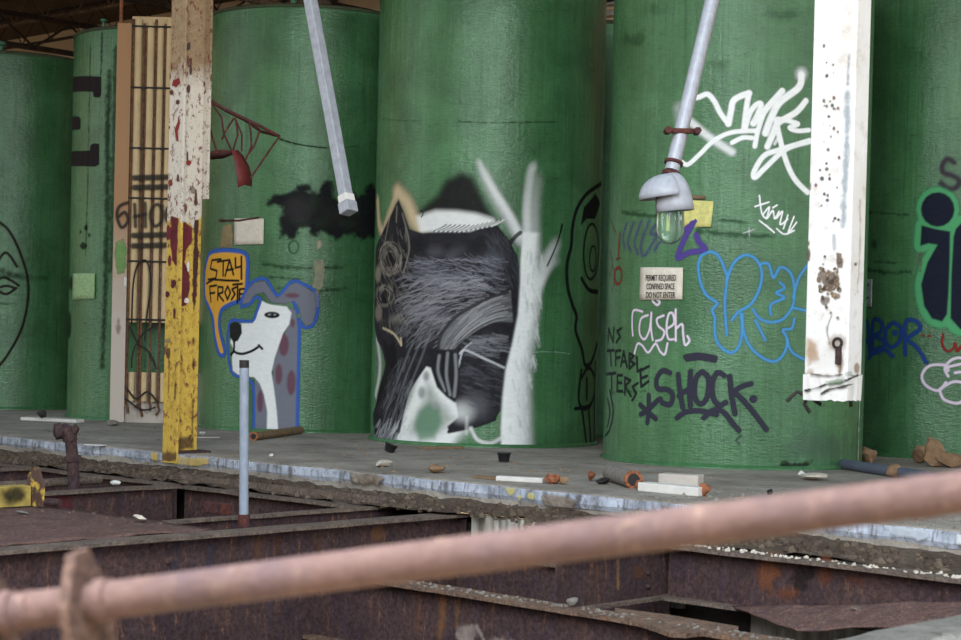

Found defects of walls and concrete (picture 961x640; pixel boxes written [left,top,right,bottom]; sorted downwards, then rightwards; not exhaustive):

peeling [169,42,192,104]
peeling [165,187,199,319]
spalling [817,253,857,319]
rust [162,399,194,461]
spalling [506,488,575,509]